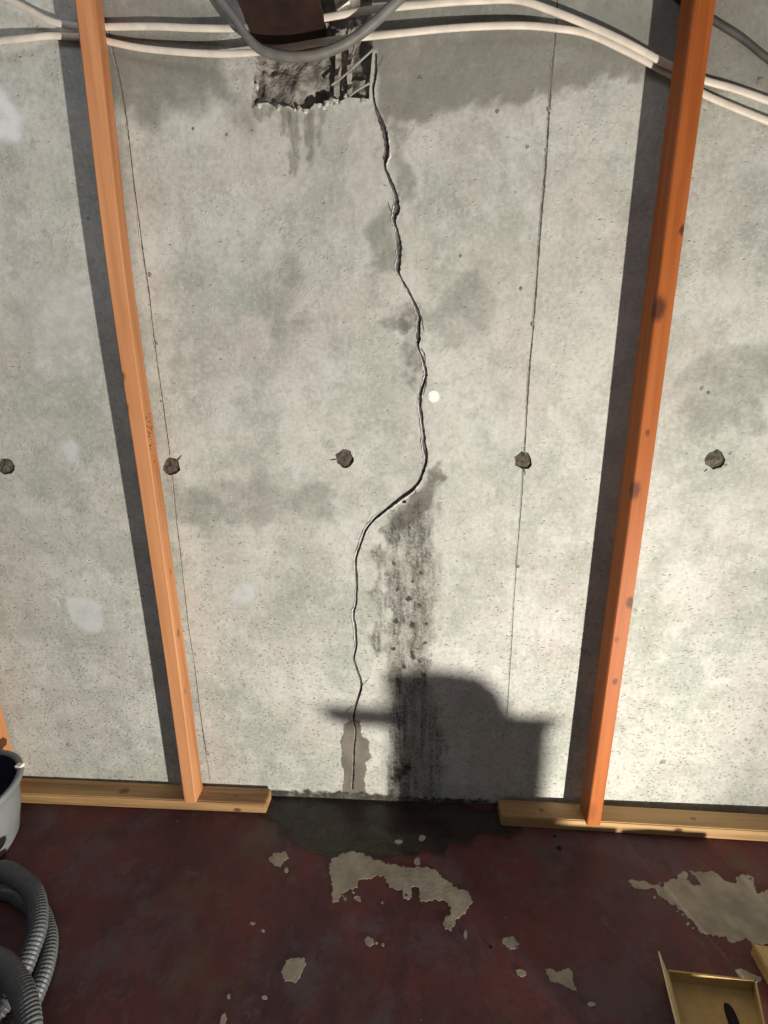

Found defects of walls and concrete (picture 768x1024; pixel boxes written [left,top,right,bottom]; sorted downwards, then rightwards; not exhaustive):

spalling [252,0,374,114]
damp [373,0,680,127]
damp [707,0,768,86]
damp [343,113,381,251]
damp [399,142,417,226]
crack [345,53,428,789]
damp [260,397,520,859]
peeling [329,851,473,940]
peeling [628,871,768,945]